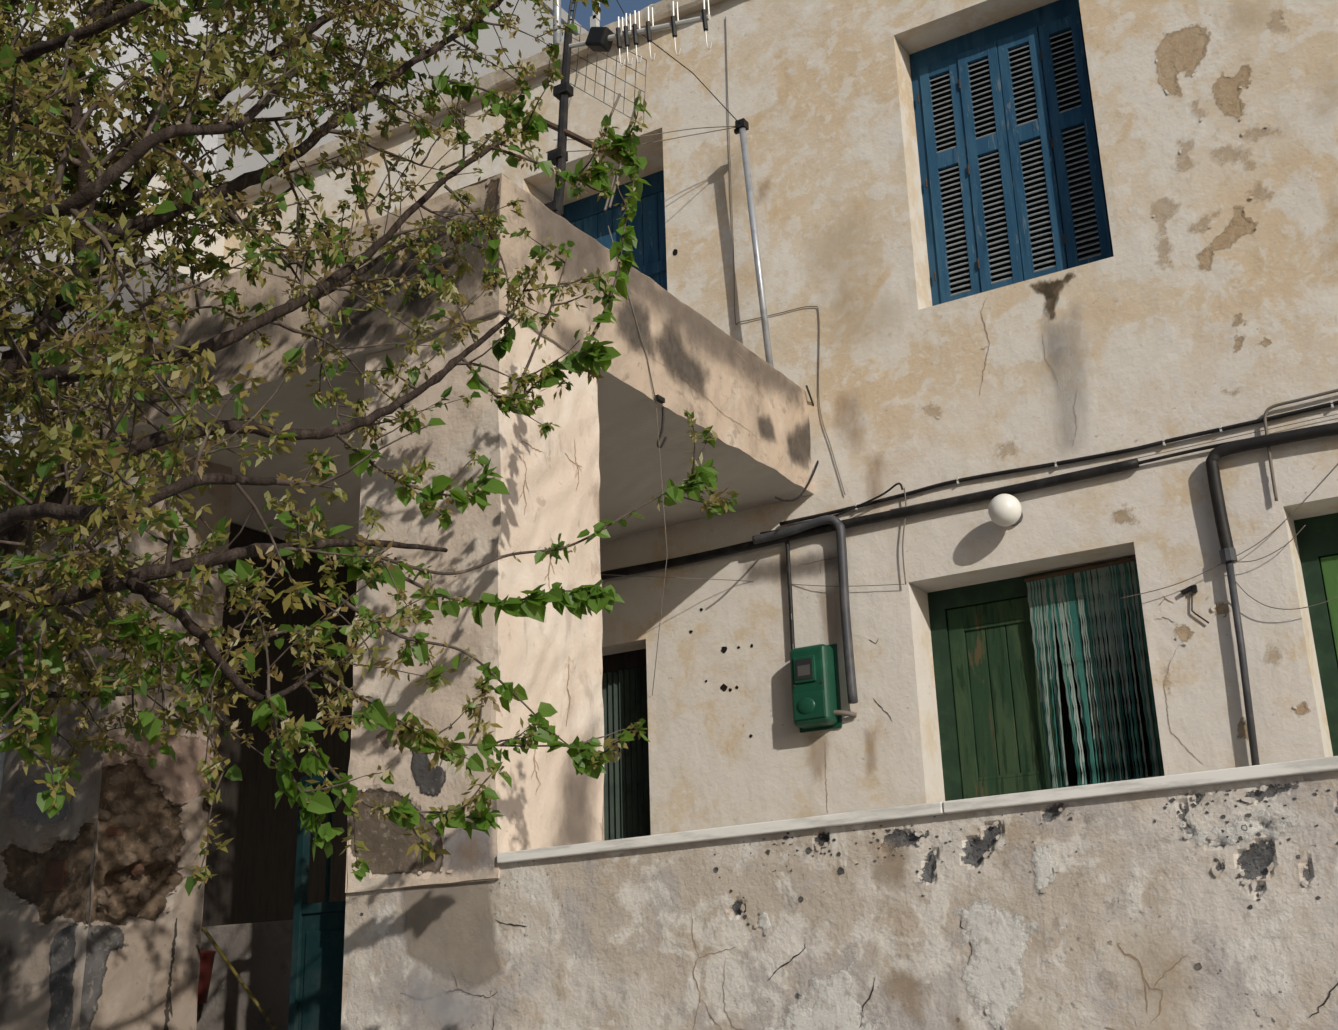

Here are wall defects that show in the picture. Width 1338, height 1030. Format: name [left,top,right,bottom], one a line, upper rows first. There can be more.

peeling [1155,23,1212,121]
peeling [1213,65,1278,169]
peeling [1152,198,1177,263]
peeling [1190,184,1272,271]
damp [618,267,799,395]
damp [1032,273,1073,319]
damp [759,418,811,465]
spalling [0,733,211,930]
spalling [348,787,494,875]
spalling [744,815,1006,897]
peeling [1153,782,1321,909]
crack [1118,944,1188,1022]